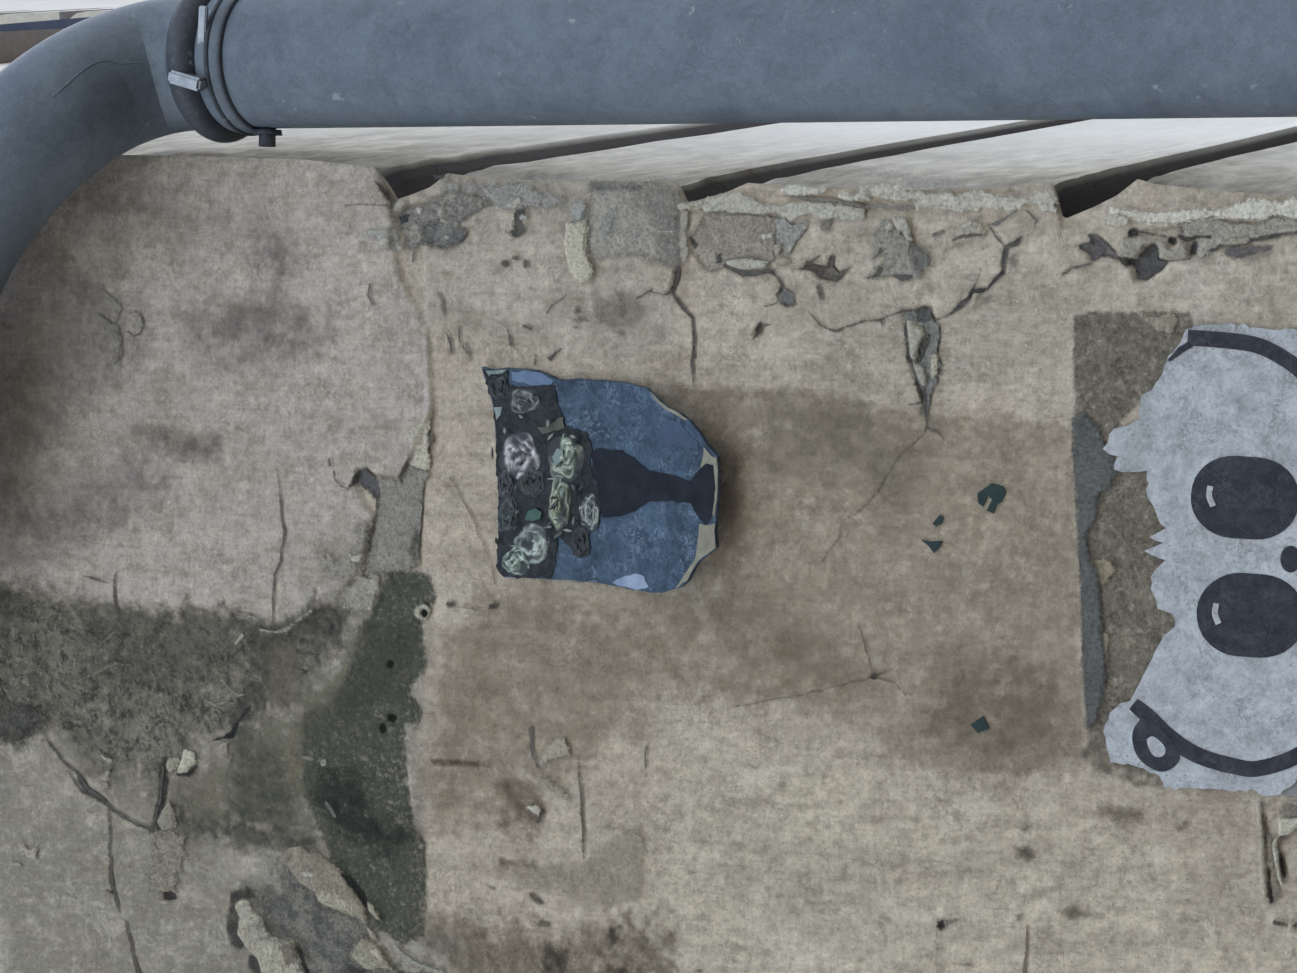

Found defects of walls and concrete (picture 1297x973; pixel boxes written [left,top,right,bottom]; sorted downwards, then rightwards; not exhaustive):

crack [346,172,394,209]
crack [636,203,696,383]
spalling [392,170,1059,299]
crack [765,209,1038,332]
flaking render [1056,196,1297,280]
flaking render [328,458,430,574]
crack [46,739,164,973]
leakage [155,747,315,849]
leakage [320,773,408,853]
spalling [226,860,405,973]